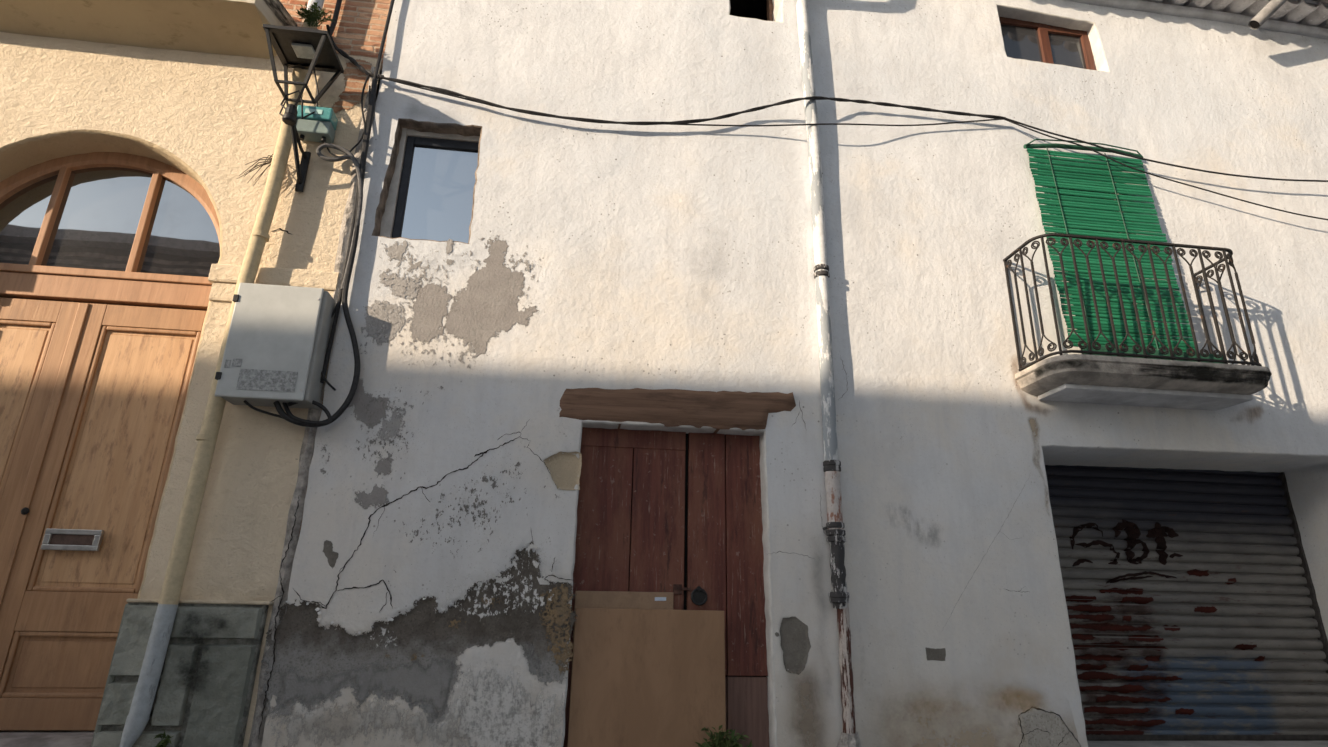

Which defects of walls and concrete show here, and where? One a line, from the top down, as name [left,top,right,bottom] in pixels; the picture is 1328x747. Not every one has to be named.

mould [265,0,297,26]
peeling [345,236,542,509]
peeling [394,454,528,554]
flaking render [543,451,582,498]
crack [259,421,557,734]
flaking render [261,536,578,727]
flaking render [775,617,811,675]